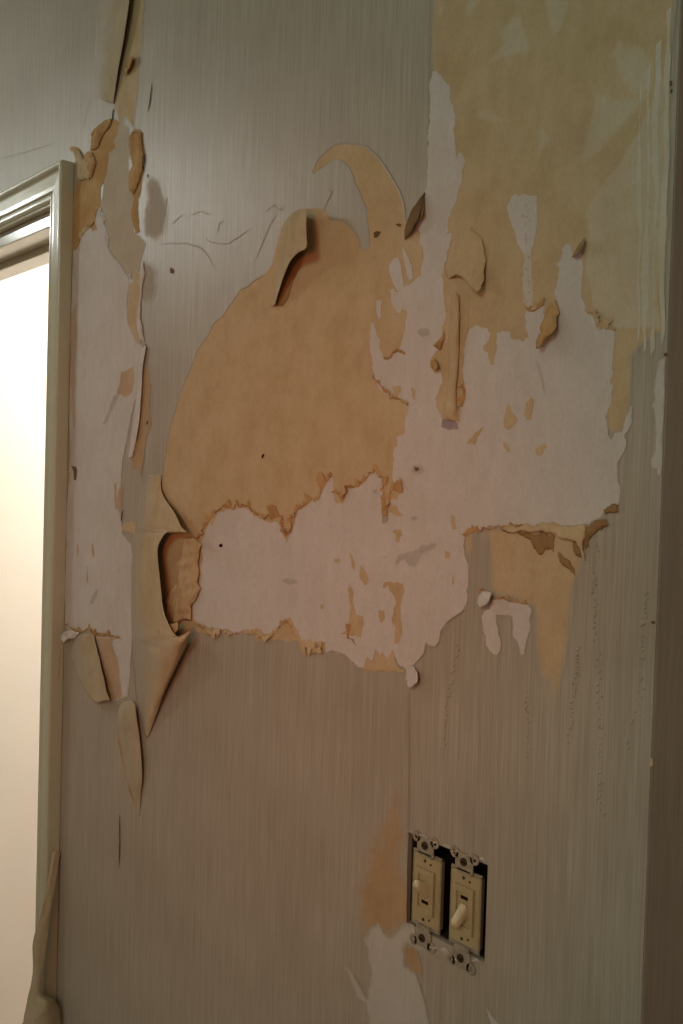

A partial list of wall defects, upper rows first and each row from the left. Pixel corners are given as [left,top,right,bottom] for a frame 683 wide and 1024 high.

flaking render [58,0,677,816]
leakage [650,356,666,476]
flaking render [342,922,447,1024]